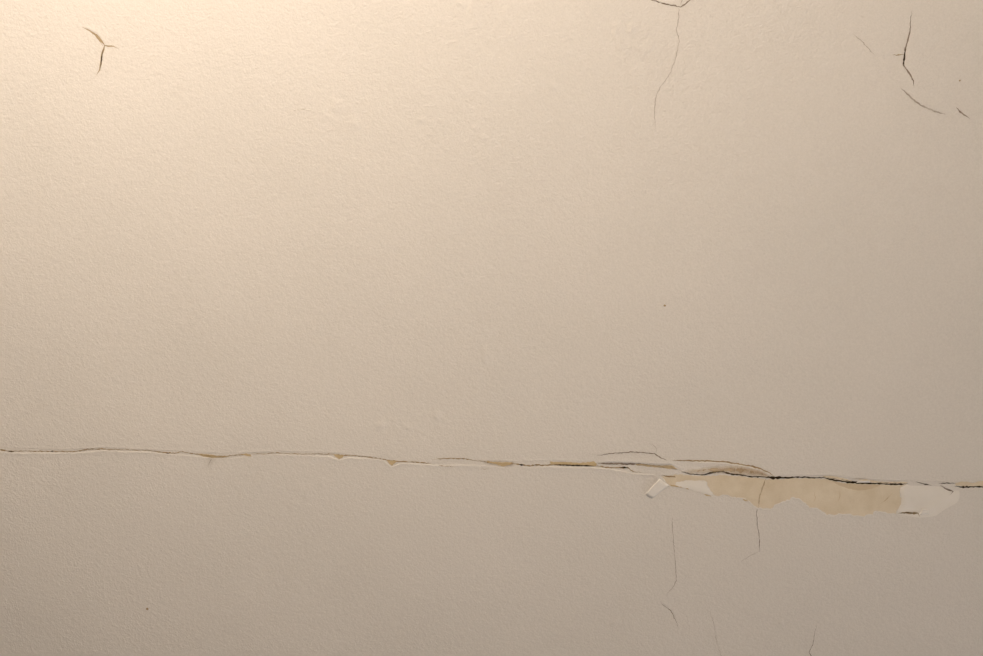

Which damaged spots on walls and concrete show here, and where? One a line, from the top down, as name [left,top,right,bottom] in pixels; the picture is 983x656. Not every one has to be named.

crack [83,24,118,75]
crack [652,0,743,127]
crack [0,443,983,494]
peeling [645,474,960,521]